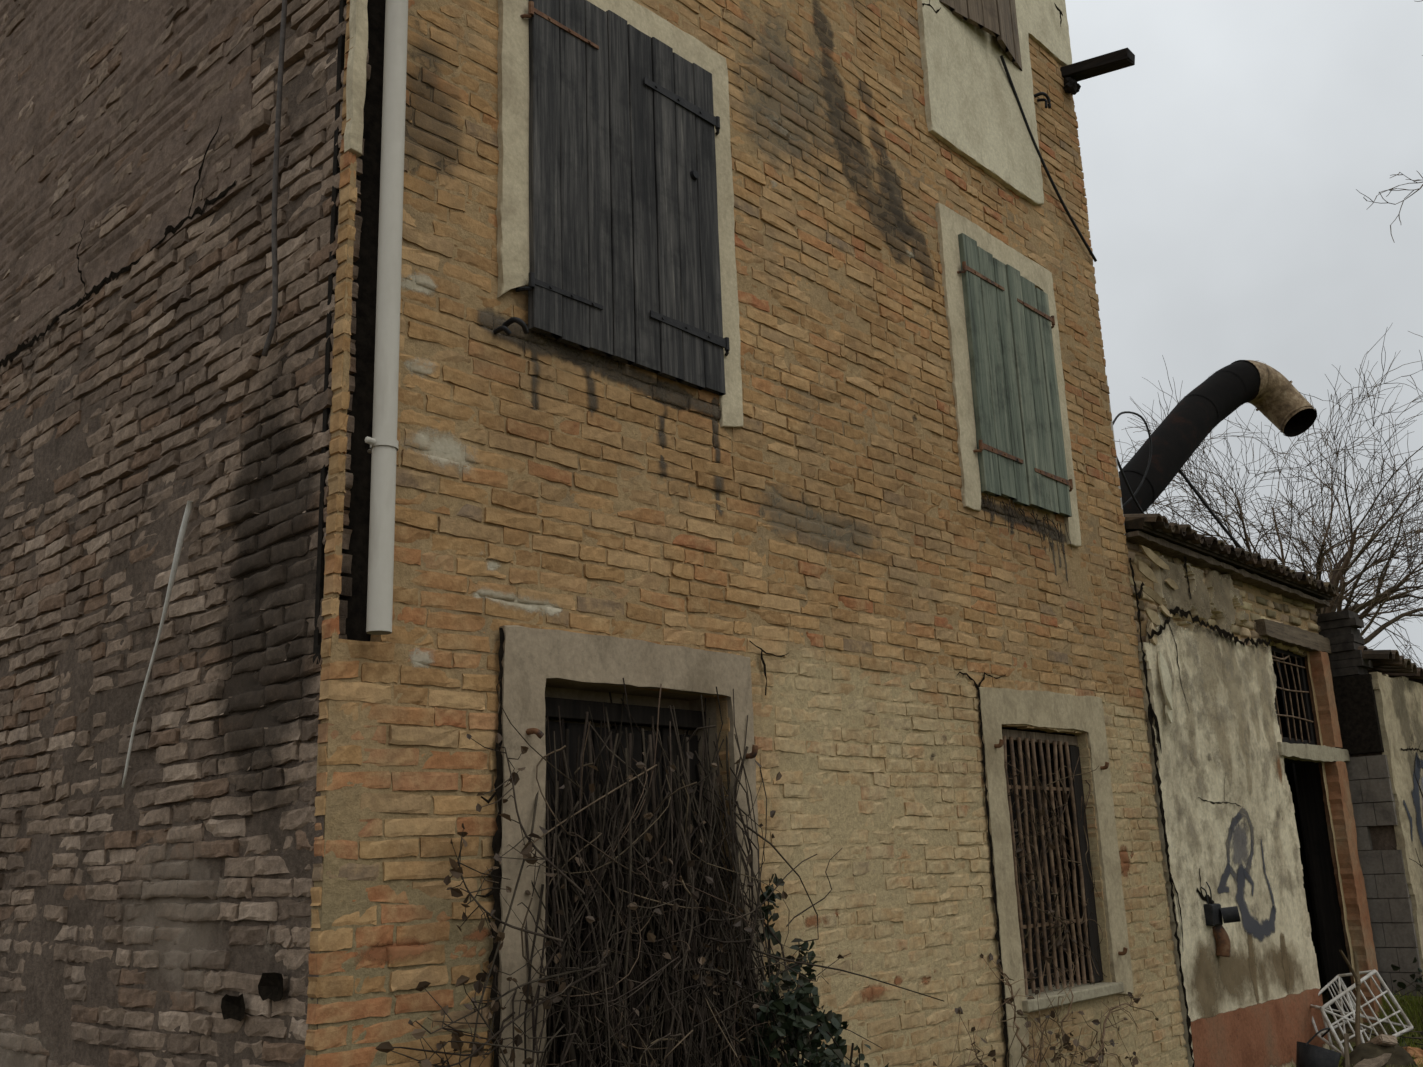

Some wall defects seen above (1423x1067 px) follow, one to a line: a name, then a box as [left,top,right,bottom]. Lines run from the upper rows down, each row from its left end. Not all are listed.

water stain [478,310,723,514]
flaking render [1136,545,1272,723]